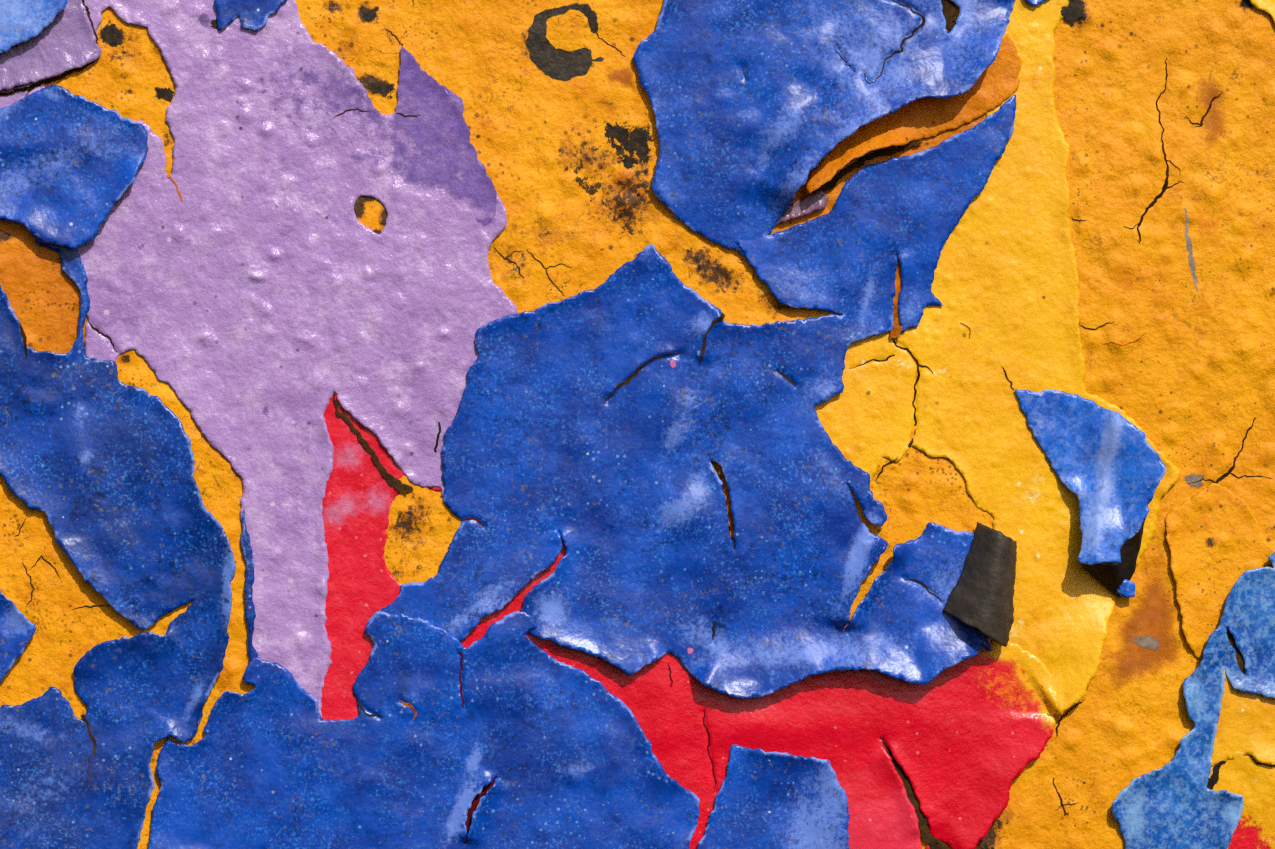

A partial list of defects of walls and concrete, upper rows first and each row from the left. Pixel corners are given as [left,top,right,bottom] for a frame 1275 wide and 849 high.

peeling [0,0,176,353]
water stain [564,159,636,235]
water stain [595,121,654,169]
crack [1124,58,1223,243]
peeling [0,475,193,721]
peeling [116,349,258,849]
peeling [384,476,462,584]
crack [849,338,933,480]
peeling [843,426,1017,648]
peeling [1165,483,1275,660]
crack [1188,418,1273,484]
peeling [836,747,922,849]